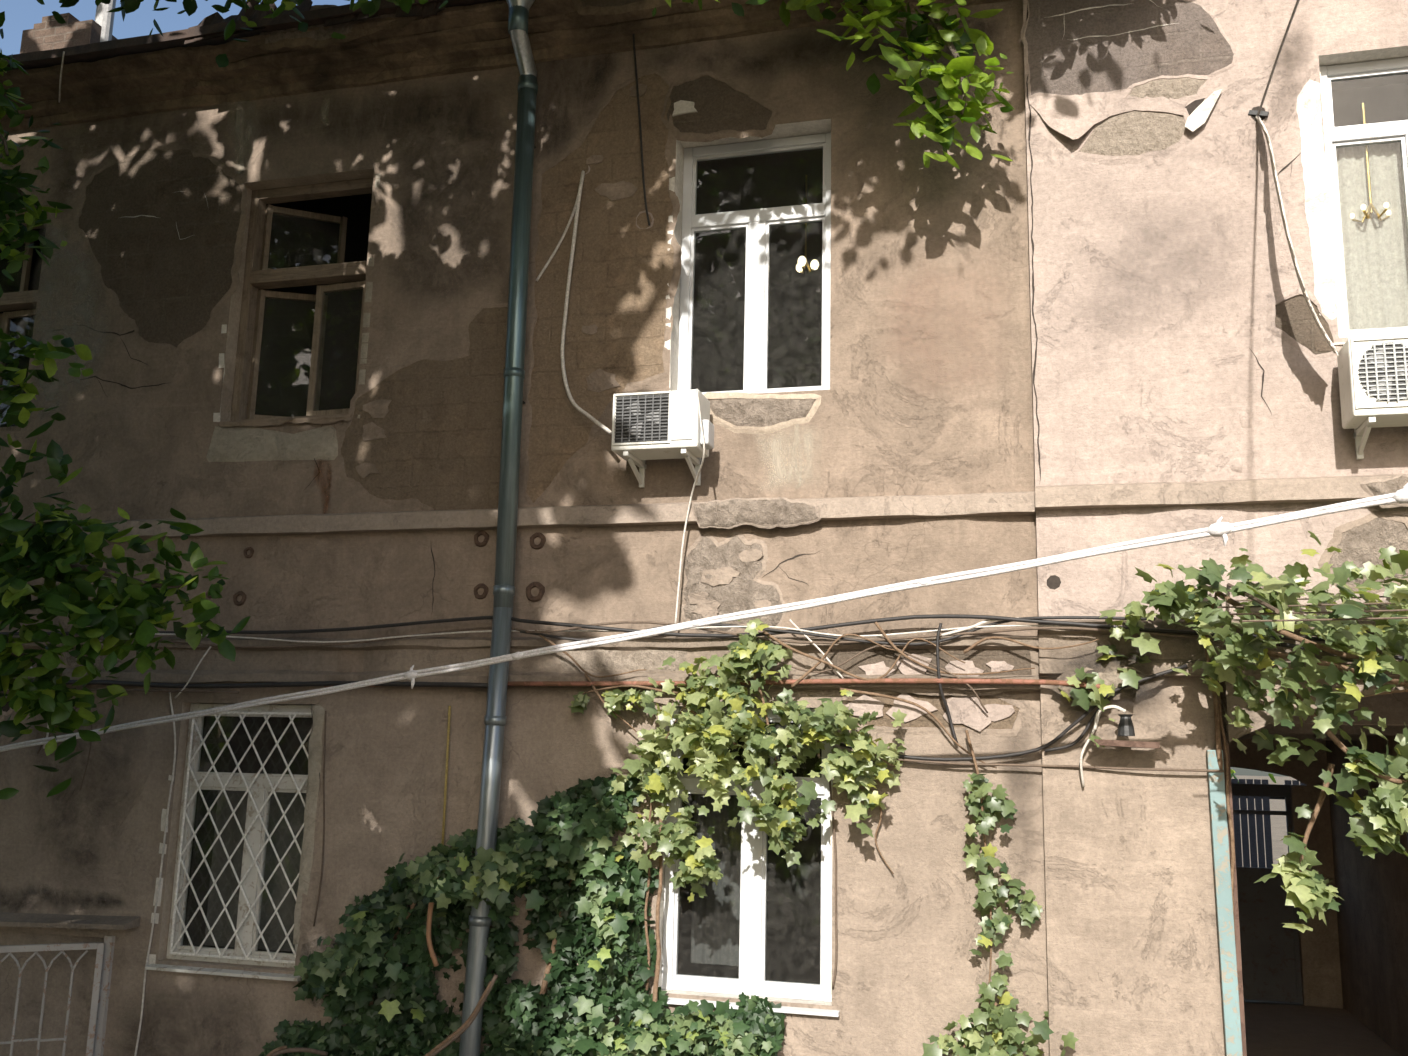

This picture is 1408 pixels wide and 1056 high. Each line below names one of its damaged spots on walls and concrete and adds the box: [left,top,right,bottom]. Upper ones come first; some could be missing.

flaking render [1020,0,1237,165]
flaking render [75,145,247,355]
flaking render [338,301,508,511]
flaking render [522,69,778,507]
flaking render [1266,288,1341,359]
flaking render [551,497,821,673]
flaking render [818,633,1039,738]
flaking render [1052,660,1164,700]